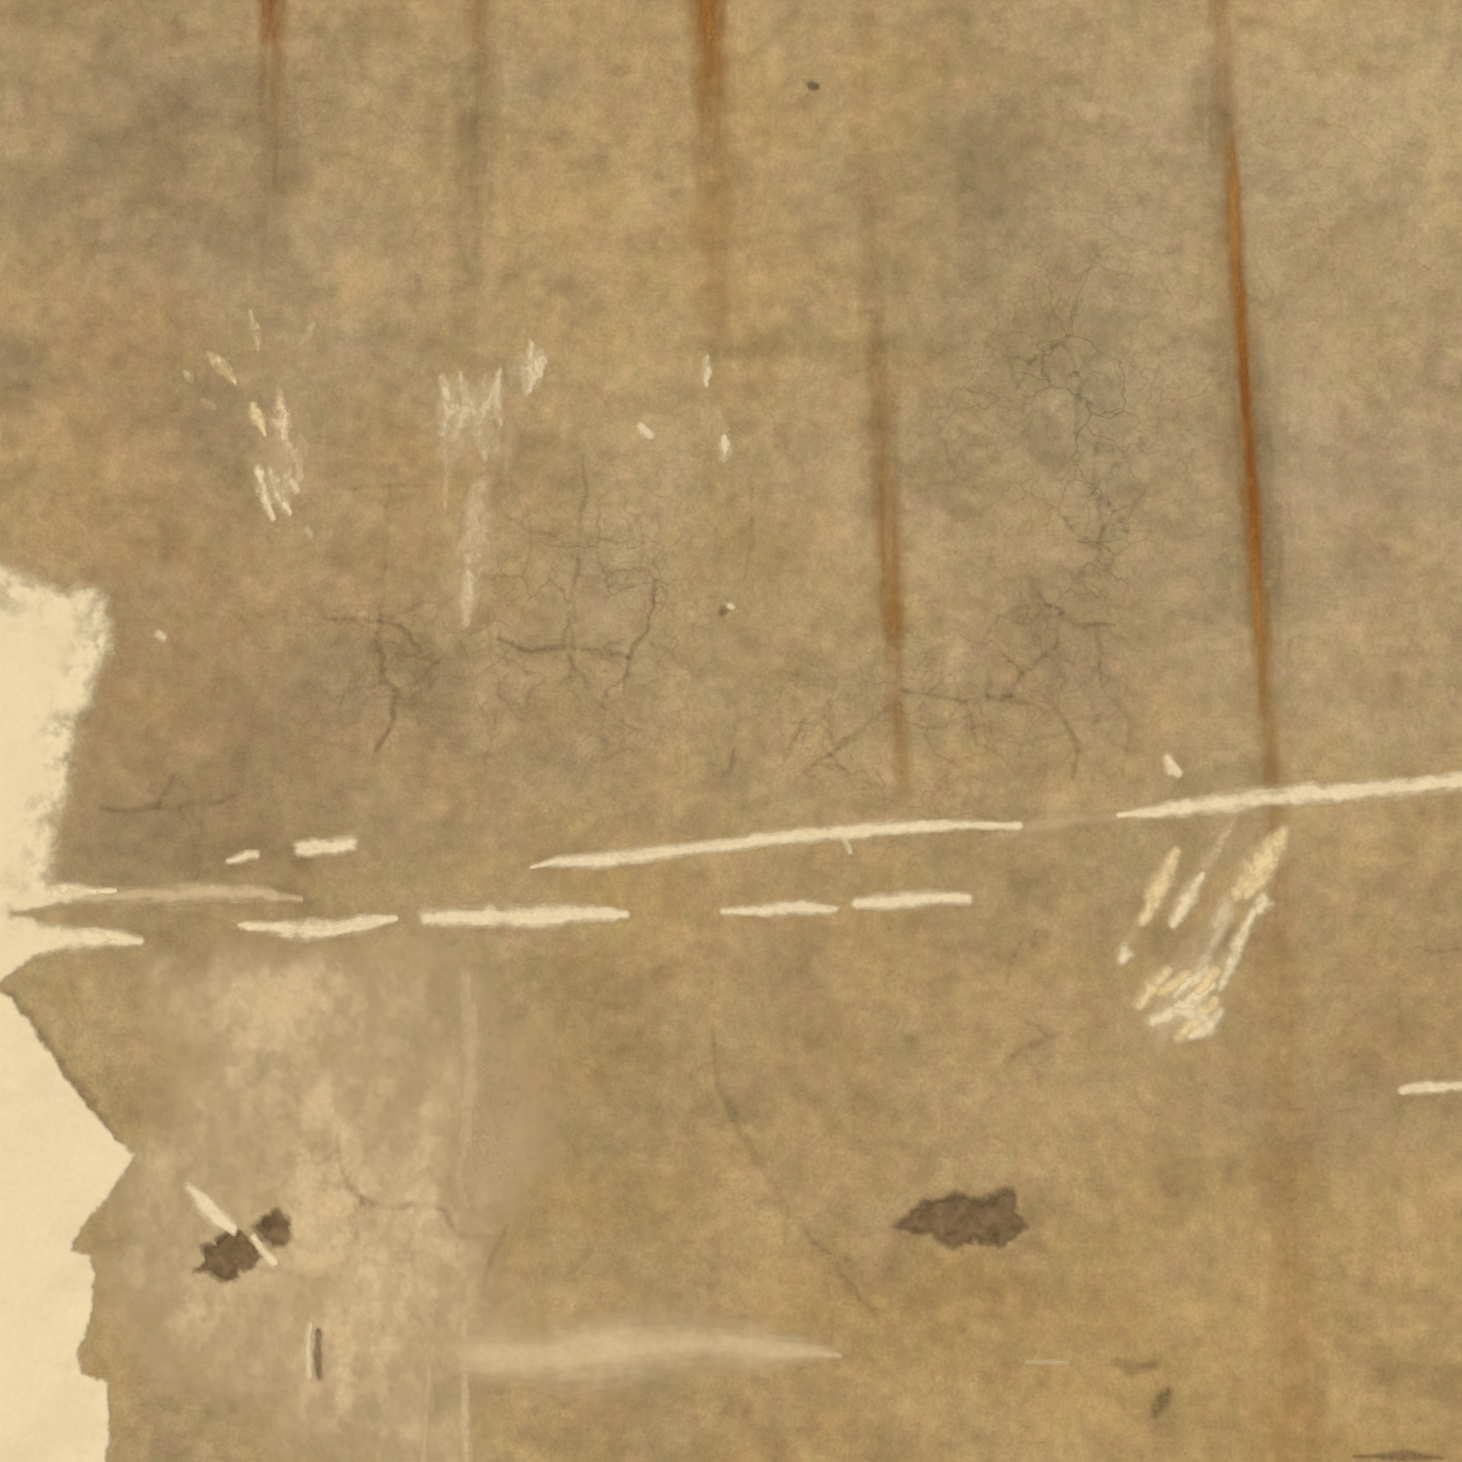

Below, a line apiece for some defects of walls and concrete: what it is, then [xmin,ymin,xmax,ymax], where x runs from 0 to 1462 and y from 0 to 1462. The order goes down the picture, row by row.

corrosion [1227,146,1266,685]
peeling [0,566,144,1462]
spalling [185,1182,290,1281]
spalling [897,1191,1027,1247]